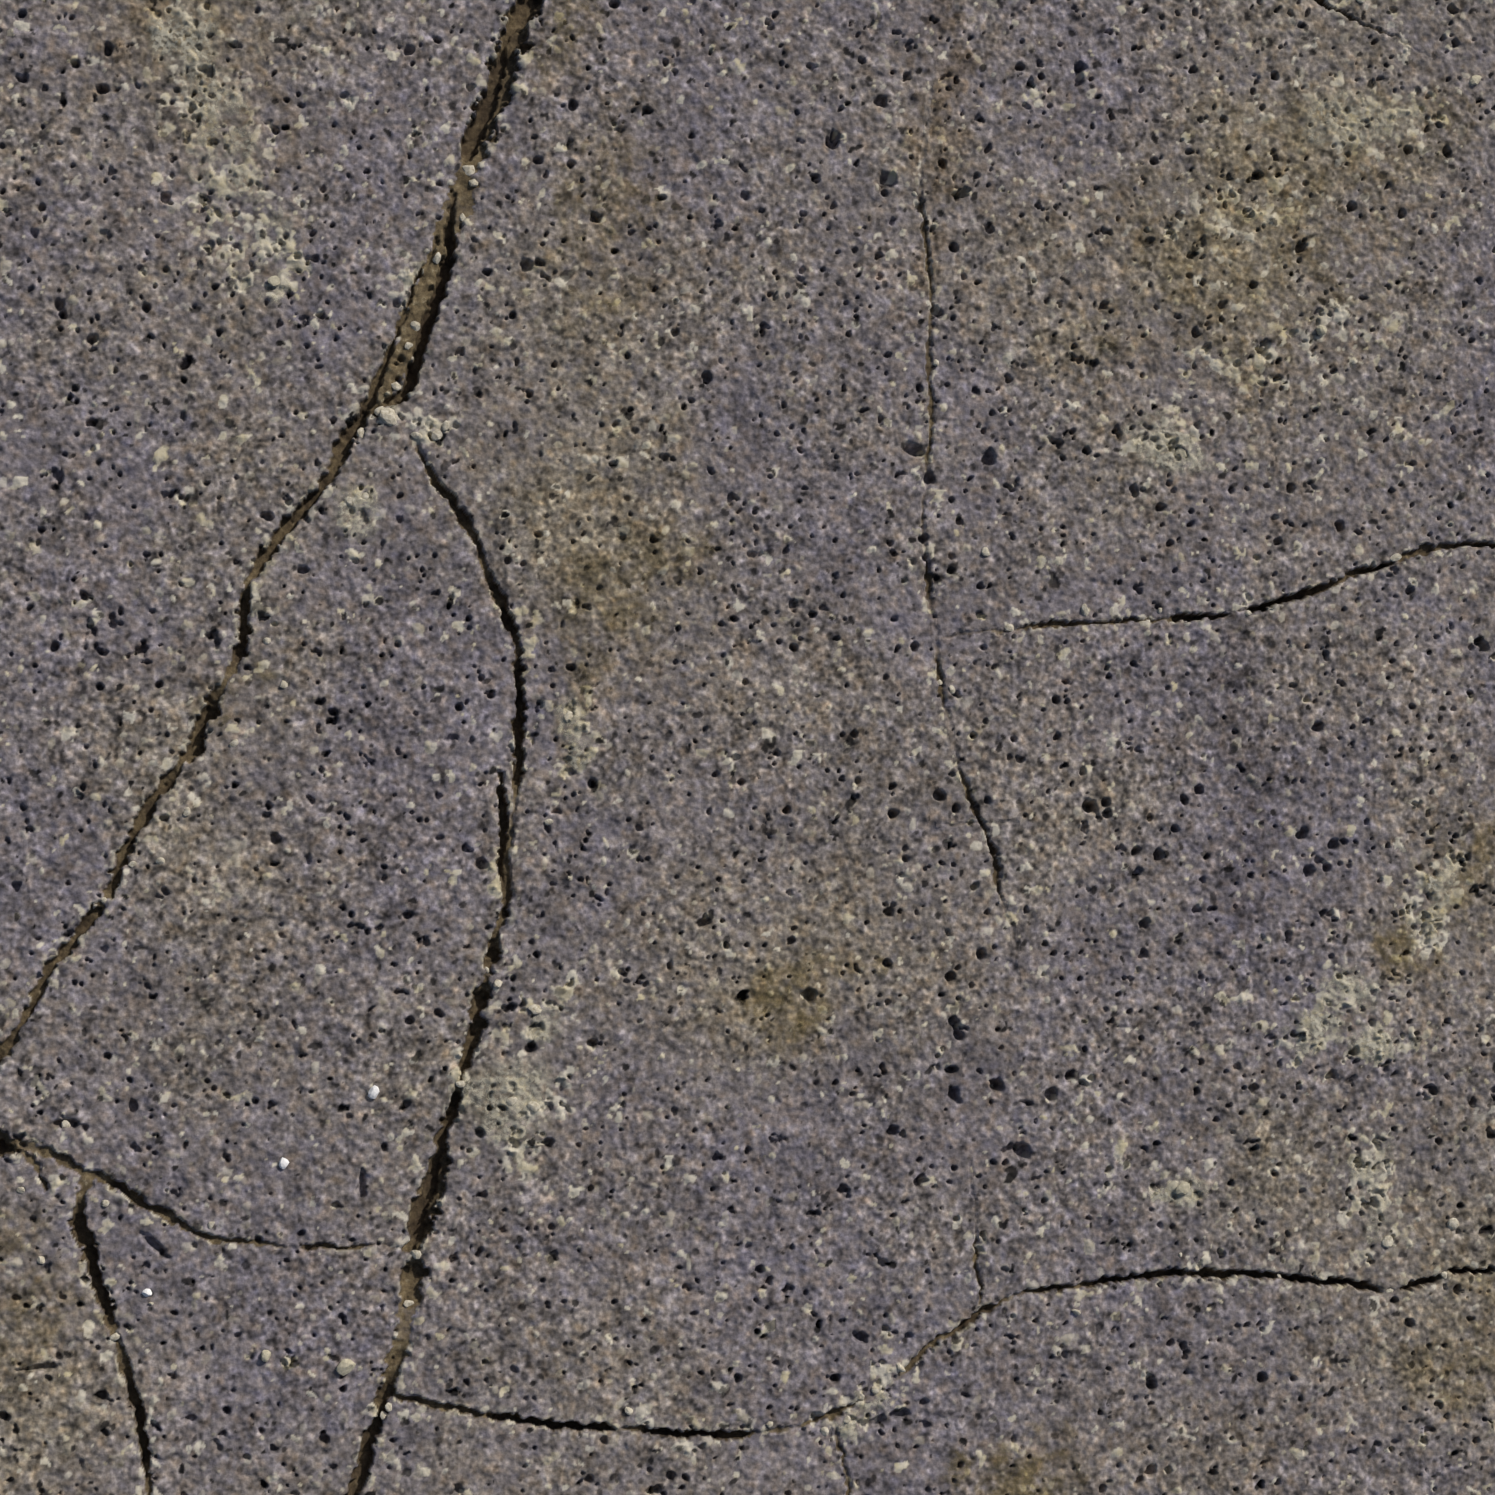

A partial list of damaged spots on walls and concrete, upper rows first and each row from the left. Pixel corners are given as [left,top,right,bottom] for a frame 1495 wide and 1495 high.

crack [0,0,544,1064]
crack [0,421,1495,1495]
crack [912,56,1495,992]
crack [1314,0,1444,65]